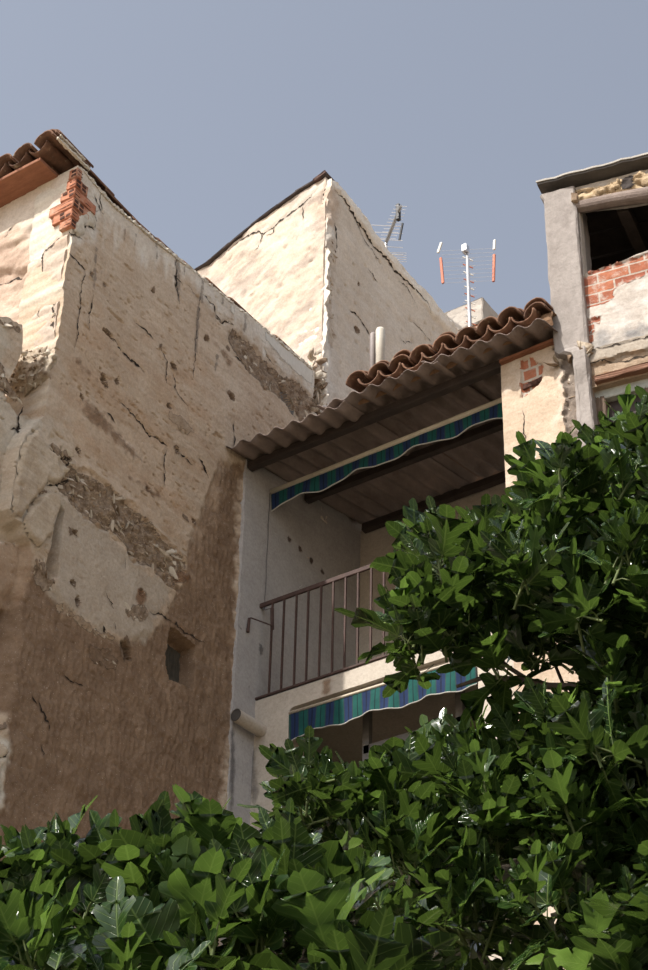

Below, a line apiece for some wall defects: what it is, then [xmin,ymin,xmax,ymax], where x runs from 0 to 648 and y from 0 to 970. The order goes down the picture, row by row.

spalling [49,167,96,233]
spalling [0,319,20,333]
spalling [0,363,22,404]
crack [0,195,102,342]
crack [111,260,233,405]
spalling [229,328,316,422]
crack [235,189,431,344]
spalling [519,357,544,398]
spalling [583,253,648,343]
crack [590,336,648,364]
spalling [8,429,185,591]
spalling [123,600,149,622]